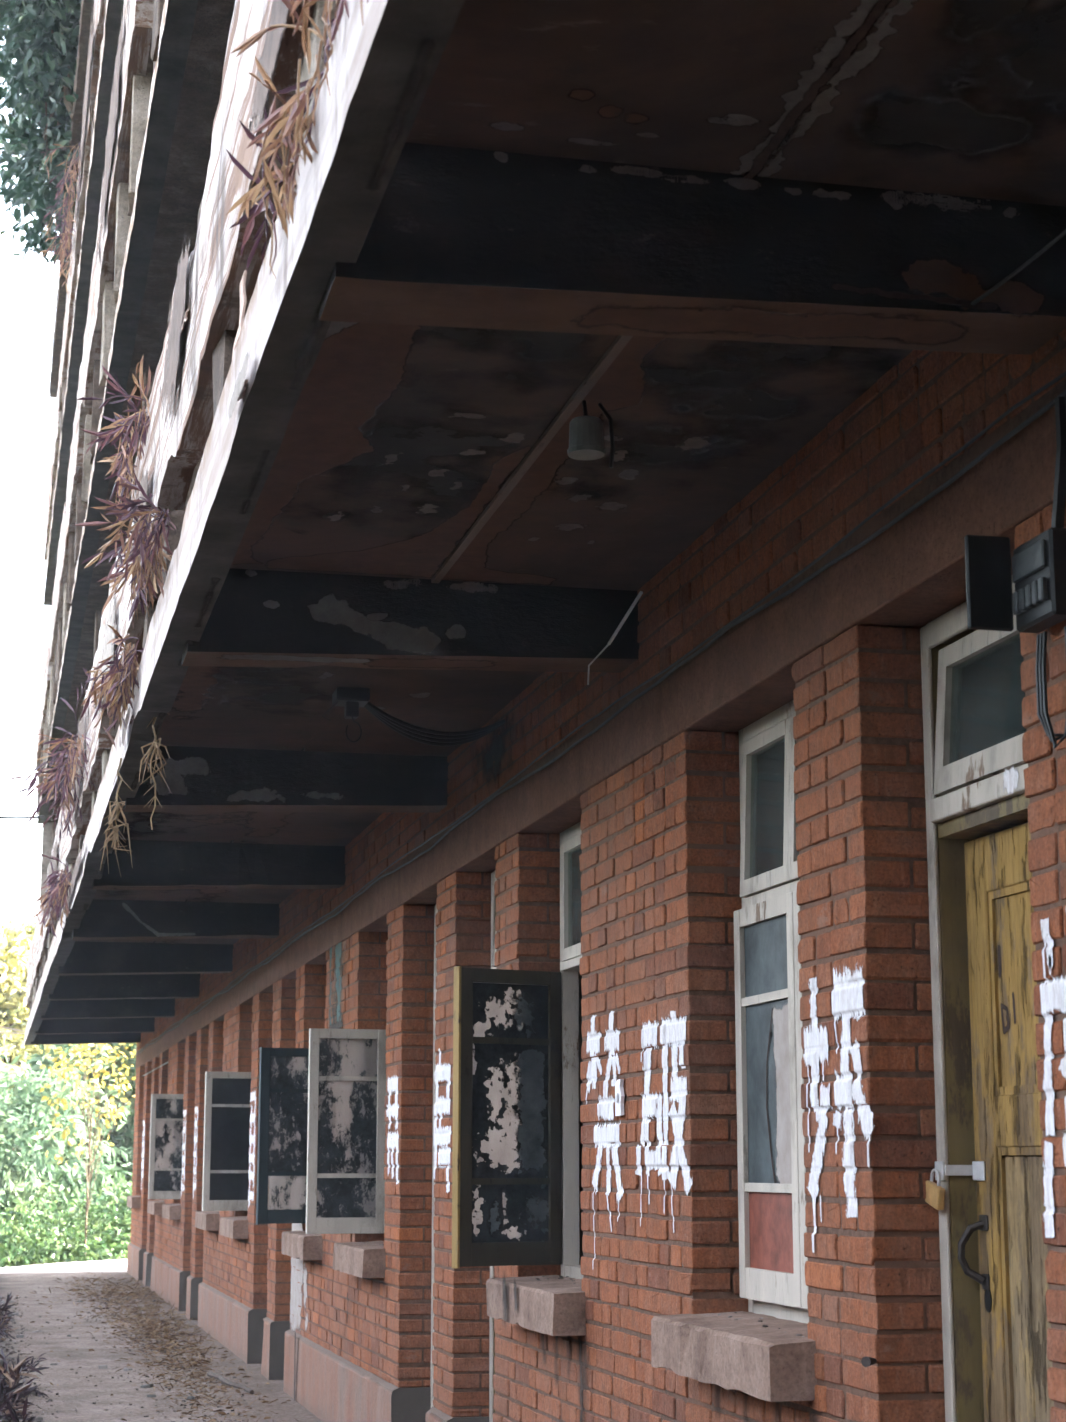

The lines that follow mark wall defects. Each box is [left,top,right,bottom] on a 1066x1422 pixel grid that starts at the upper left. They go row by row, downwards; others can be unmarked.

peeling [576,164,763,190]
spalling [306,592,467,655]